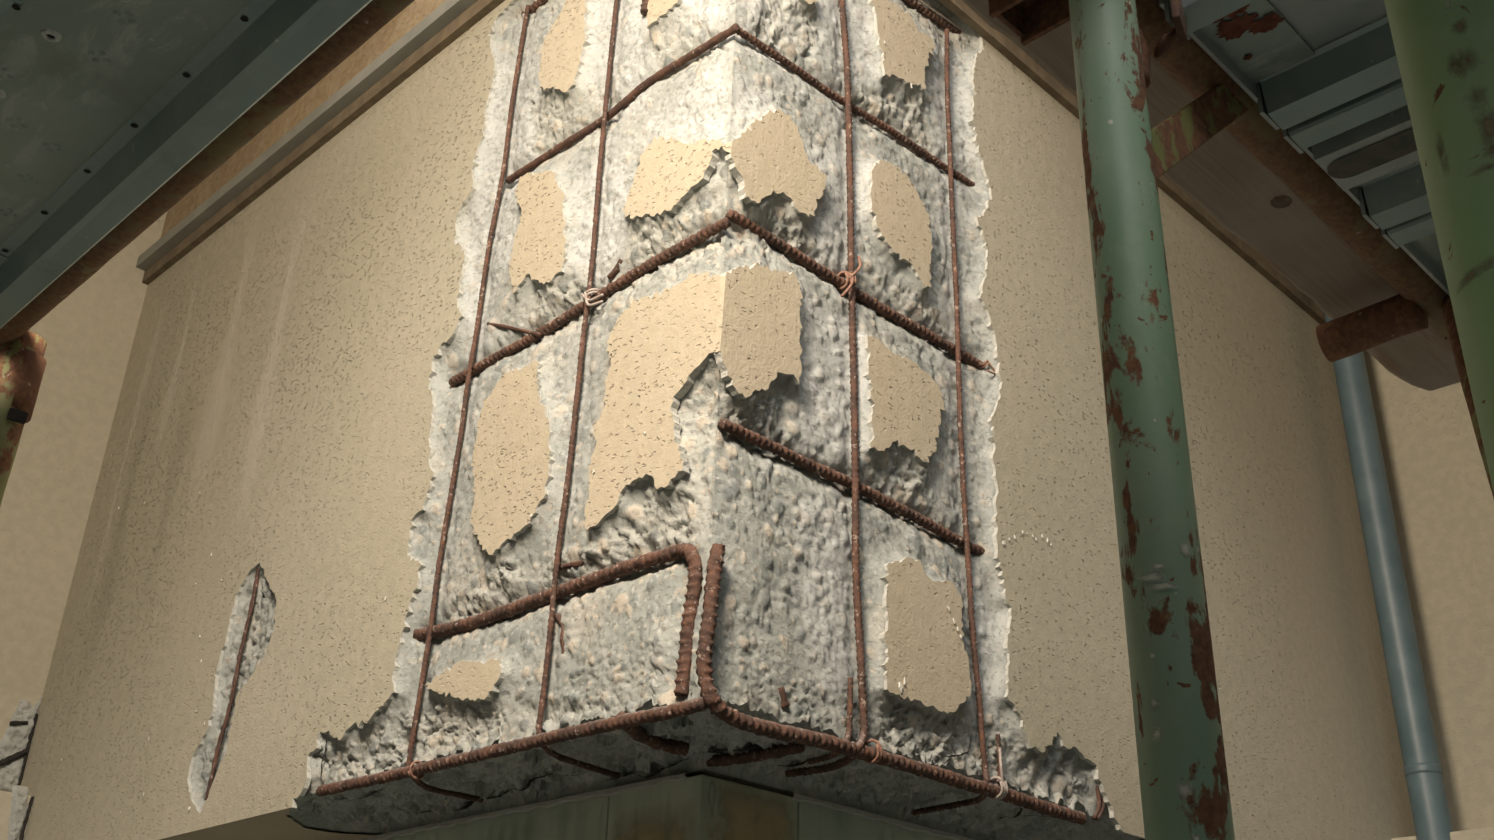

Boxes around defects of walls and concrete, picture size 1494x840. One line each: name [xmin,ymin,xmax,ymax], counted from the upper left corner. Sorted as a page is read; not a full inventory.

corrosion [1213,4,1285,41]
spalling [286,0,1145,840]
spalling [0,697,41,840]
spalling [188,566,276,811]